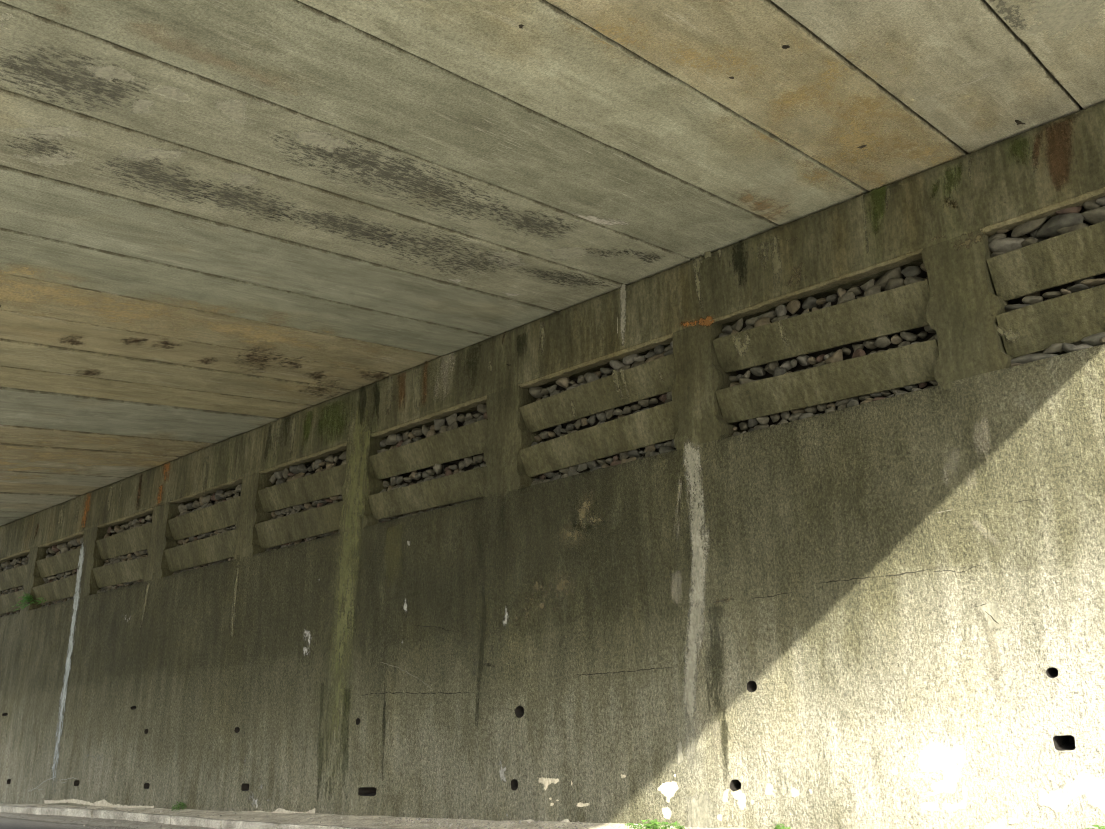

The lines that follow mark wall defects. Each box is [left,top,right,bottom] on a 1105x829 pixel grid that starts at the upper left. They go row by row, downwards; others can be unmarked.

water stain [0,46,150,112]
rust [1032,117,1075,191]
water stain [96,132,627,344]
water stain [586,248,660,263]
water stain [319,376,393,797]
water stain [677,440,728,773]
water stain [44,543,154,808]
spalling [537,777,573,806]
spalling [657,774,679,820]
spalling [717,789,754,821]
spalling [917,739,968,829]
spalling [1036,759,1105,814]